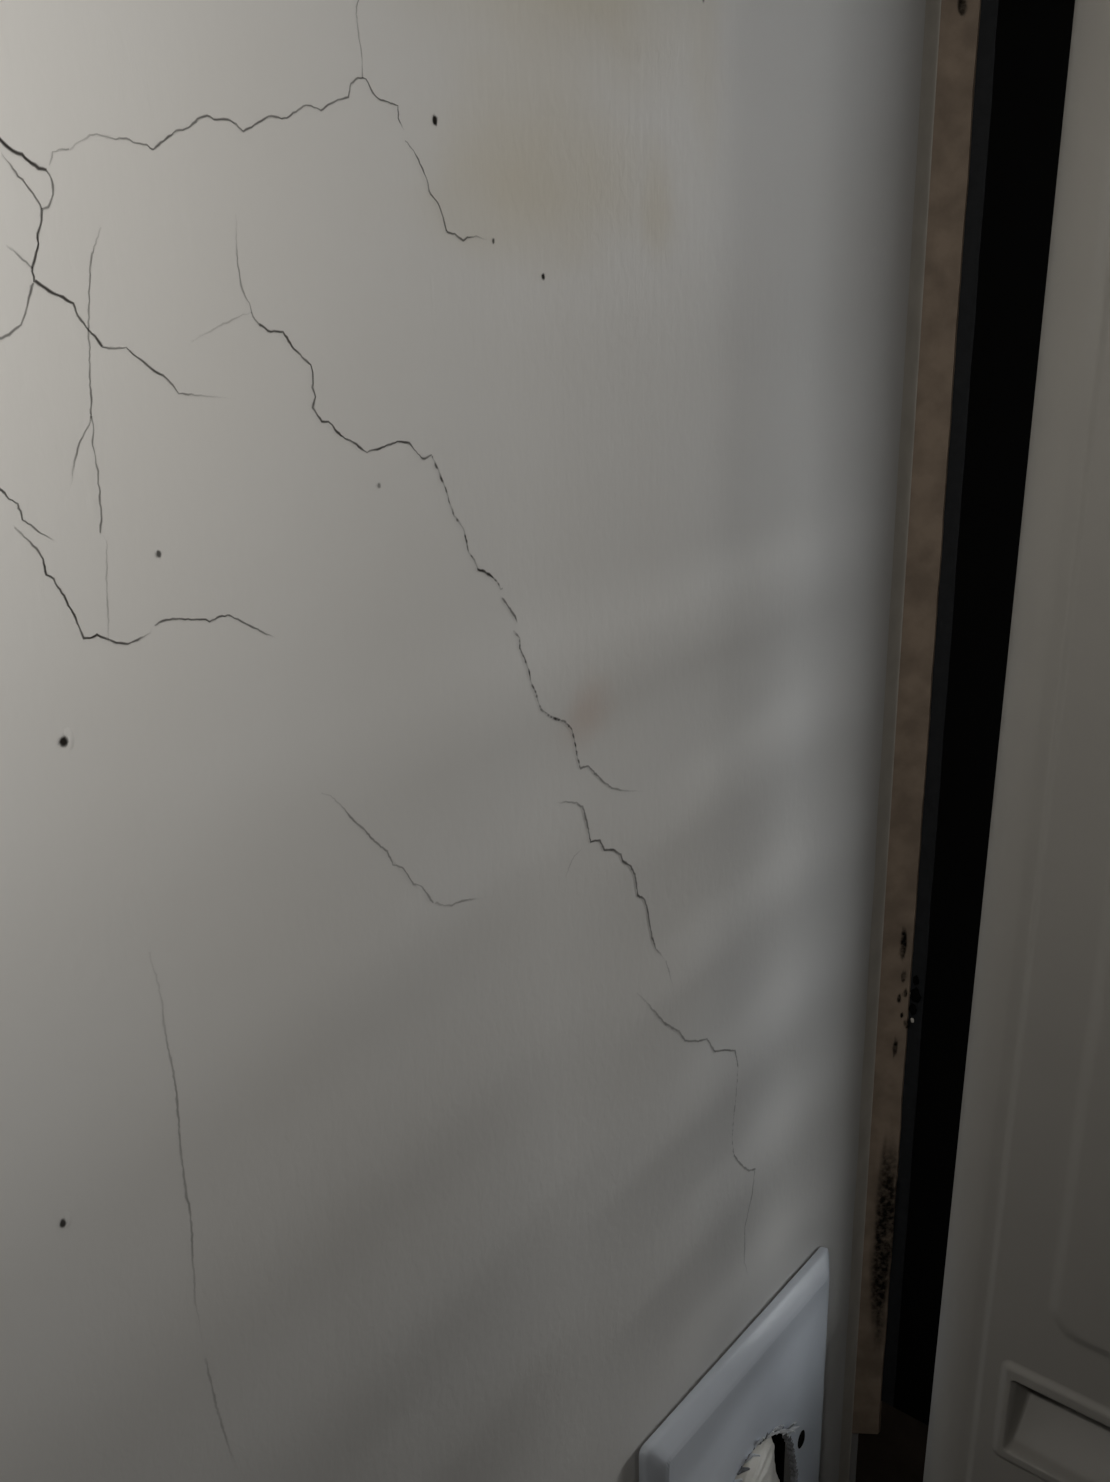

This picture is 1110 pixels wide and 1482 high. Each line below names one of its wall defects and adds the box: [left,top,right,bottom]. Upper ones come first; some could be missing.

crack [143,77,470,241]
crack [0,138,181,394]
crack [0,489,262,644]
crack [259,324,598,776]
crack [583,809,655,945]
water stain [872,1156,896,1332]